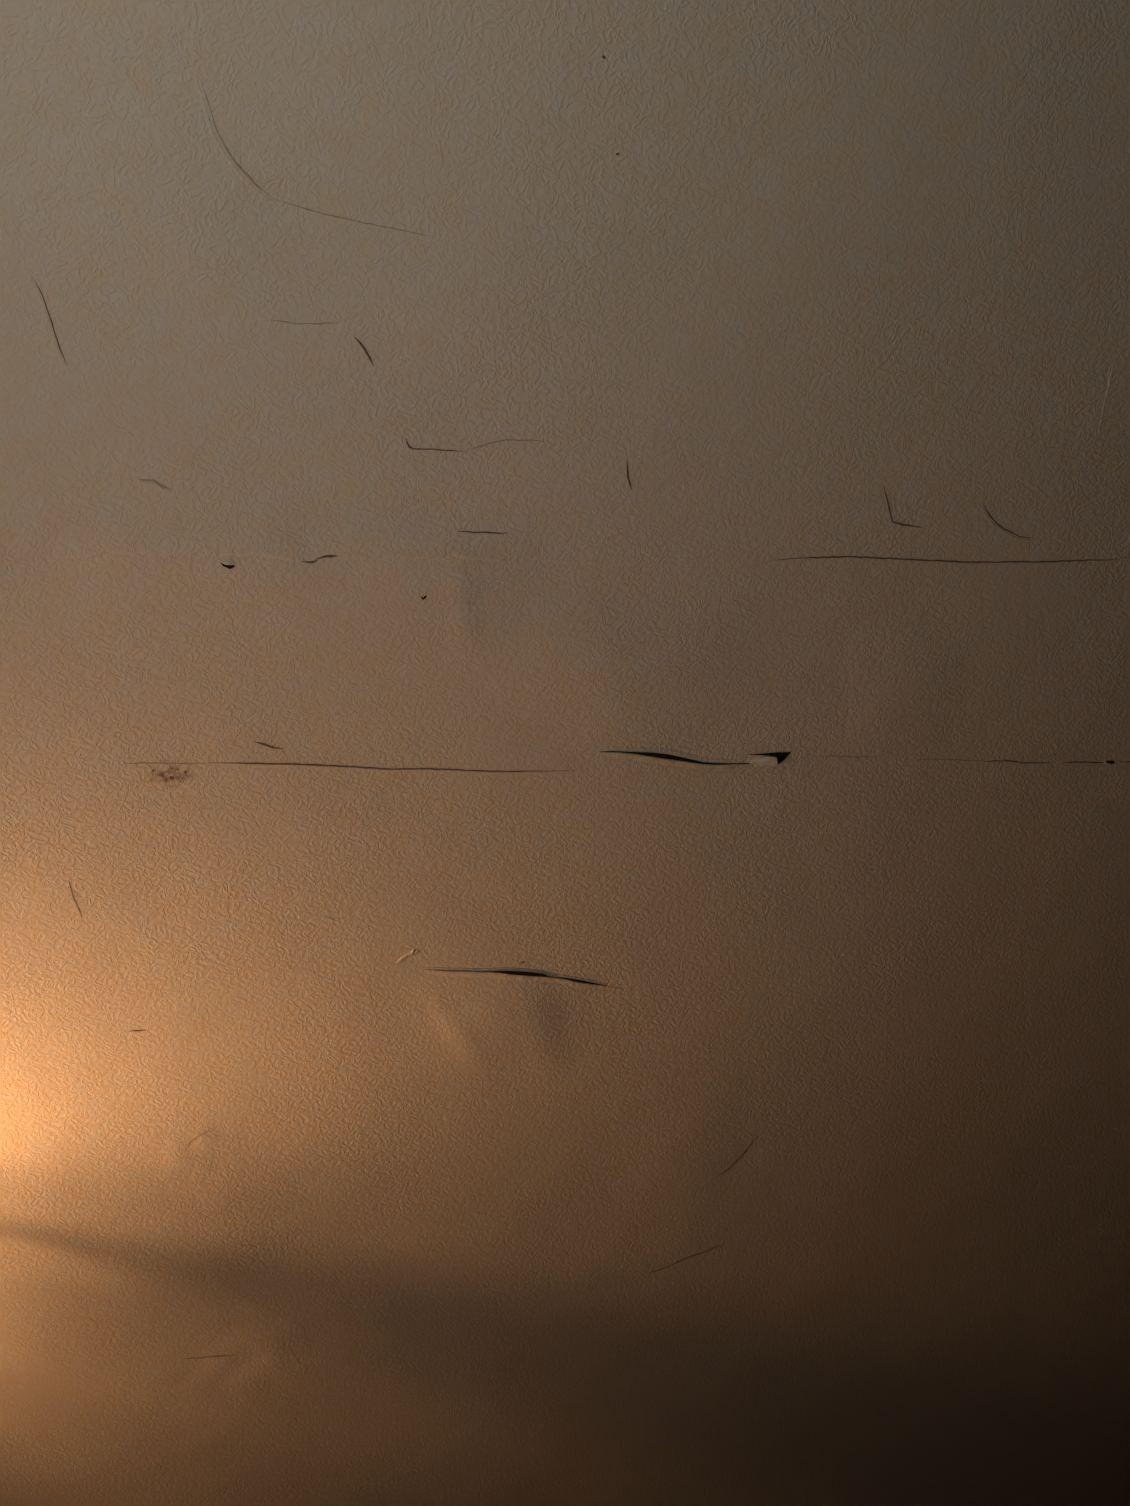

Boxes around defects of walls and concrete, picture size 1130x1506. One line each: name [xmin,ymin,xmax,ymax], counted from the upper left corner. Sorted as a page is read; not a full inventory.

crack [201,81,273,198]
crack [270,320,374,366]
crack [406,438,544,451]
crack [140,479,169,489]
crack [884,486,918,527]
crack [458,528,504,536]
crack [128,742,576,775]
crack [922,758,1130,766]